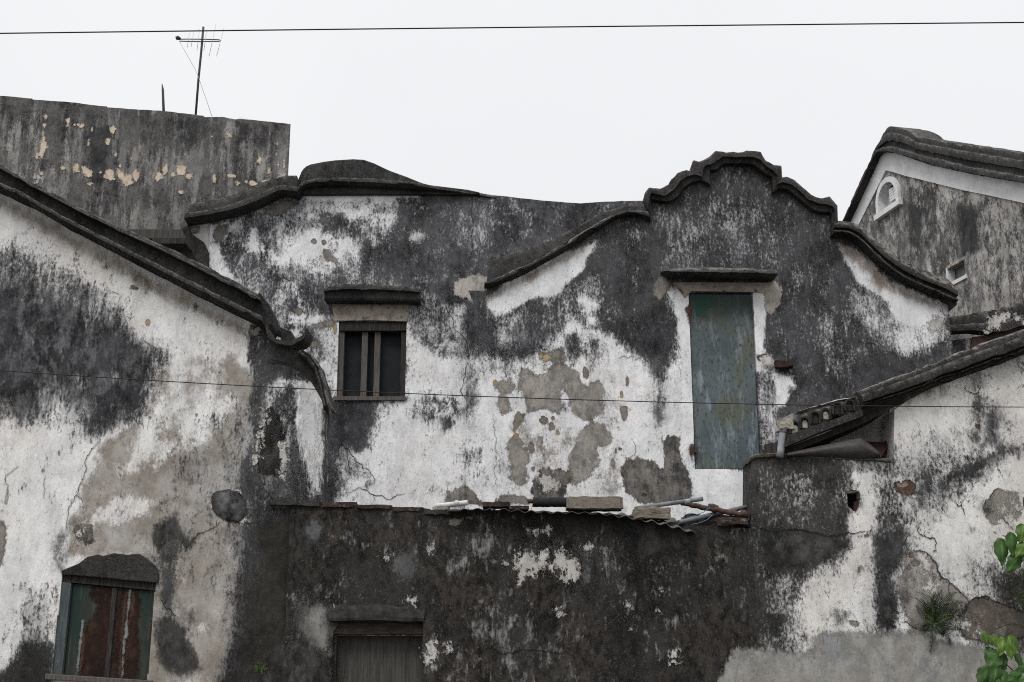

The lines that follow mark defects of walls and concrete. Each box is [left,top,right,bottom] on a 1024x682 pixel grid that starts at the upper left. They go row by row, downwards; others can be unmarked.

peeling [32,114,140,186]
peeling [155,163,193,194]
peeling [212,142,286,186]
leakage [0,261,150,430]
leakage [566,335,599,359]
leakage [636,327,668,423]
crack [338,443,396,499]
flaking render [444,346,693,528]
flaking render [983,488,1024,530]
leakage [625,519,699,613]
leakage [870,530,911,634]
spalling [897,551,1024,644]